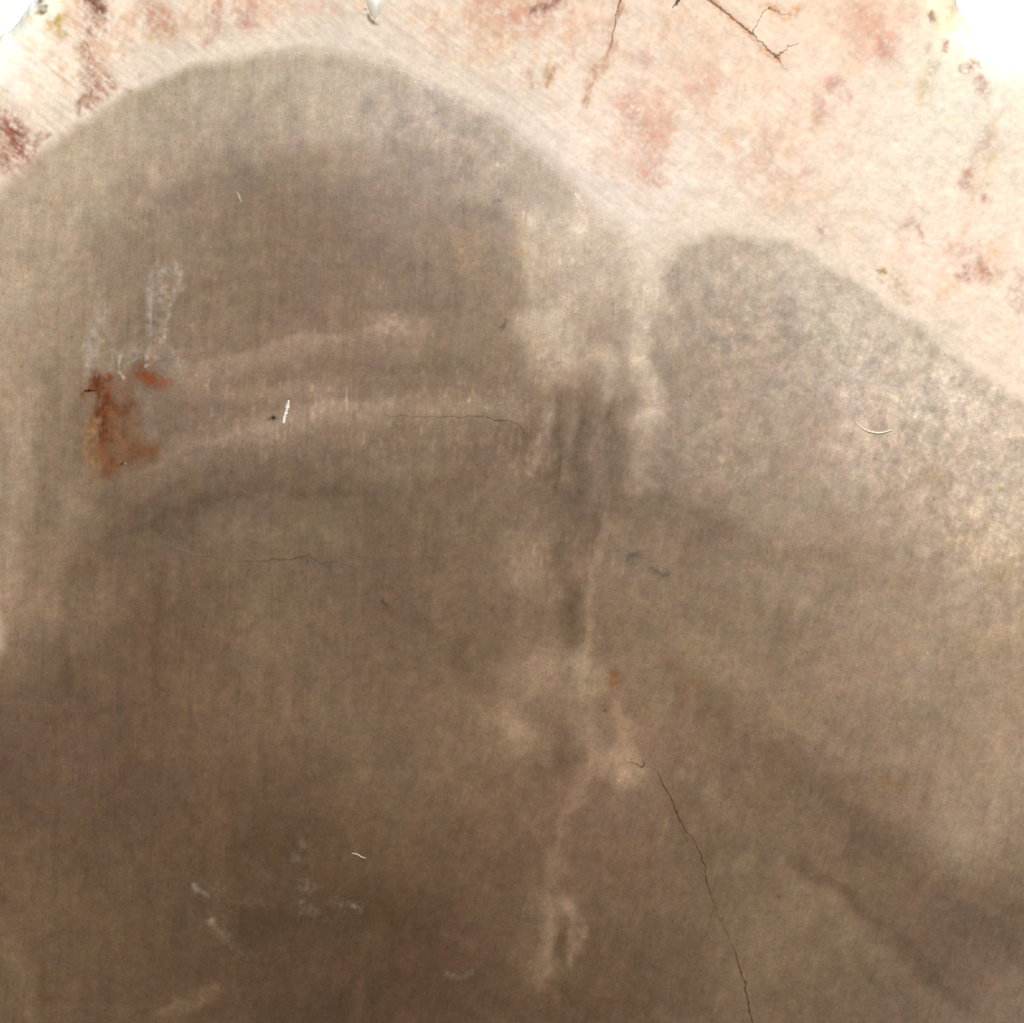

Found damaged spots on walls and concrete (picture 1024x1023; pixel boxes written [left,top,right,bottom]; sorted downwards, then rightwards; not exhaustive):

crack [576,0,631,113]
crack [673,0,807,67]
rust [74,354,179,492]